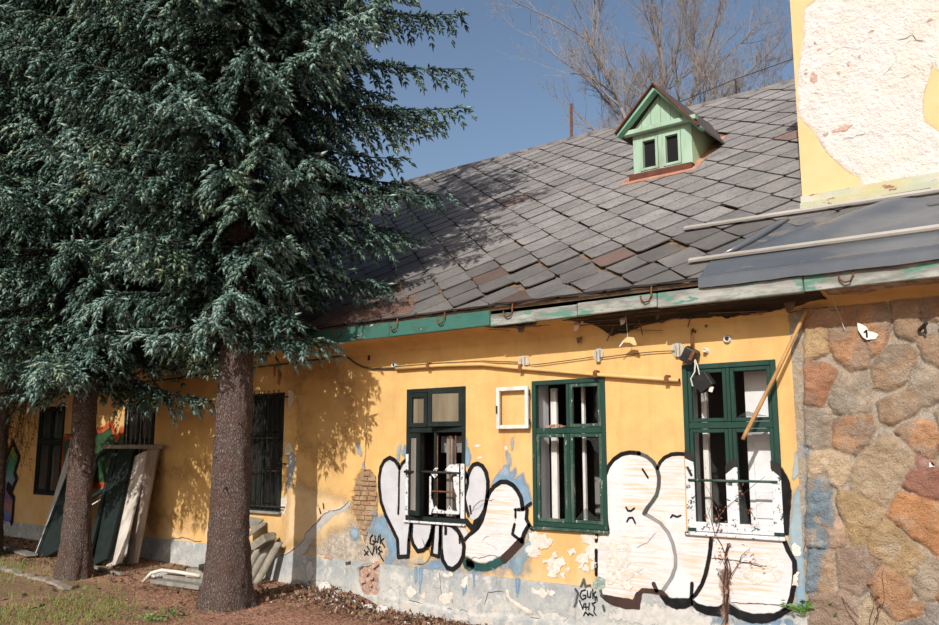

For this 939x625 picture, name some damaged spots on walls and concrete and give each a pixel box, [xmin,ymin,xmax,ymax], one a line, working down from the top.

flaking render [797,0,939,185]
flaking render [619,318,637,347]
flaking render [289,470,382,566]
peeling [525,531,601,598]